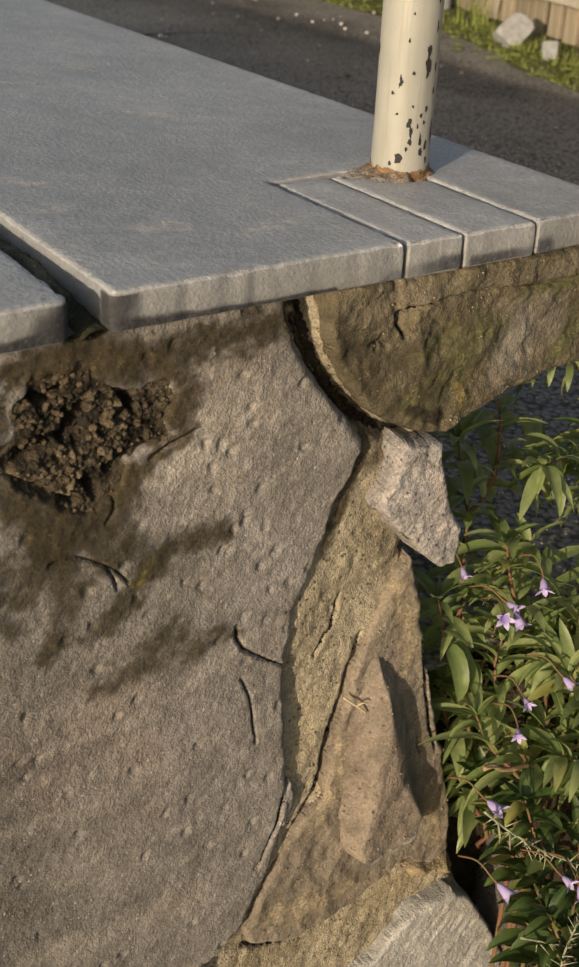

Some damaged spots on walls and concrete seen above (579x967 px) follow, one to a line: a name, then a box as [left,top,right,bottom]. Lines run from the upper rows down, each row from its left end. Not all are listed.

peeling [391,45,437,95]
peeling [388,105,432,165]
rust [370,158,429,182]
crack [370,303,433,345]
spalling [0,362,181,521]
damp [0,288,374,668]
crack [50,556,127,590]
damp [89,619,242,697]
crack [234,627,282,665]
crack [313,597,337,653]
crack [241,680,255,740]